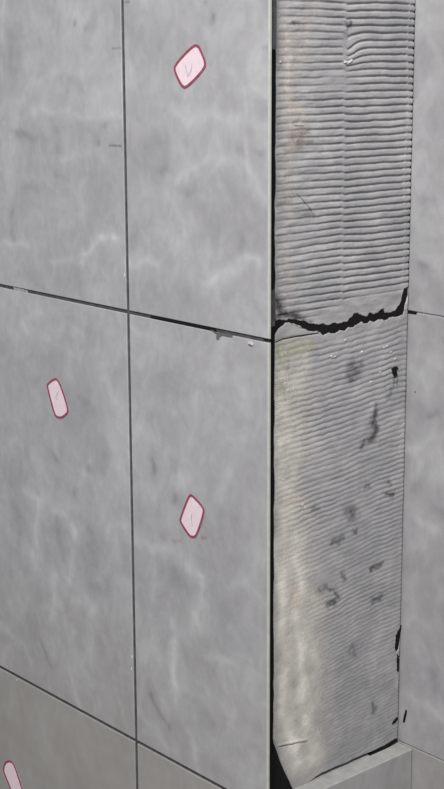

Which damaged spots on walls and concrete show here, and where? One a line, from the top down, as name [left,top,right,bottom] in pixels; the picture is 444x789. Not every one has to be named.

crack [273,287,408,343]